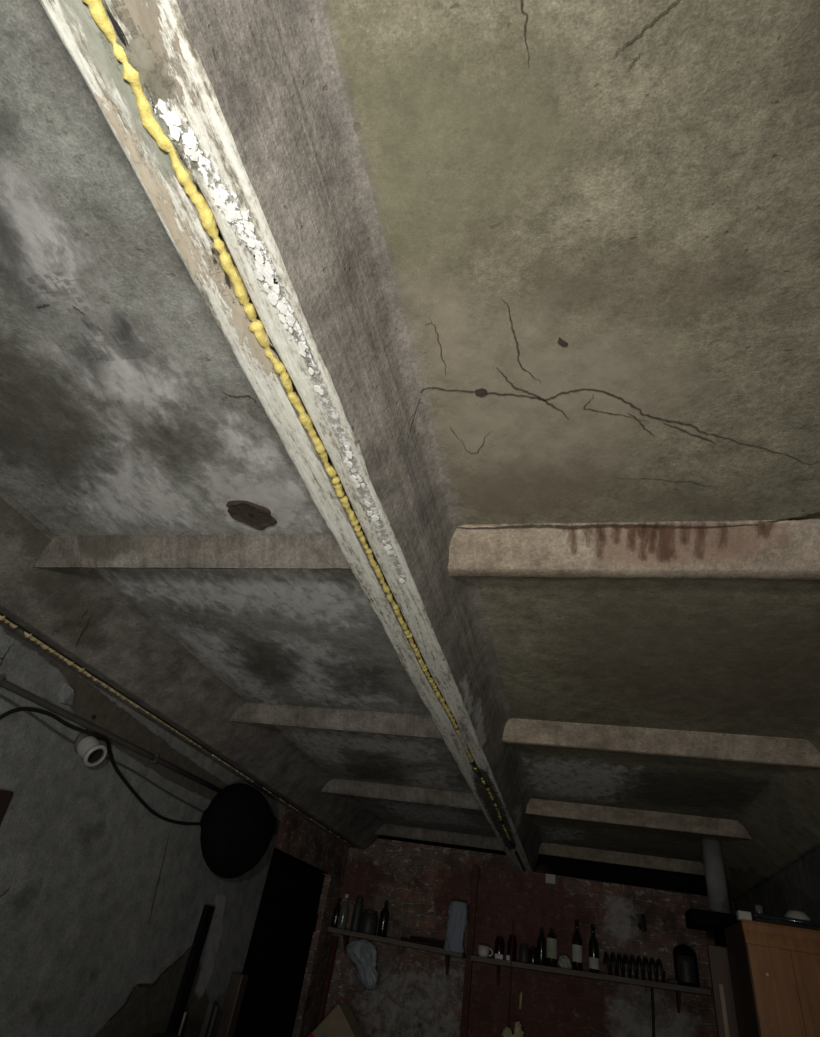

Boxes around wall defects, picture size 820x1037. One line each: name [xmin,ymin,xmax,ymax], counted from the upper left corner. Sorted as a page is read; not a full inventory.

crack [521,0,529,66]
crack [614,0,679,71]
peeling [59,0,406,583]
damp [0,163,323,534]
crack [407,298,818,465]
crack [456,512,820,529]
rust [597,524,705,559]